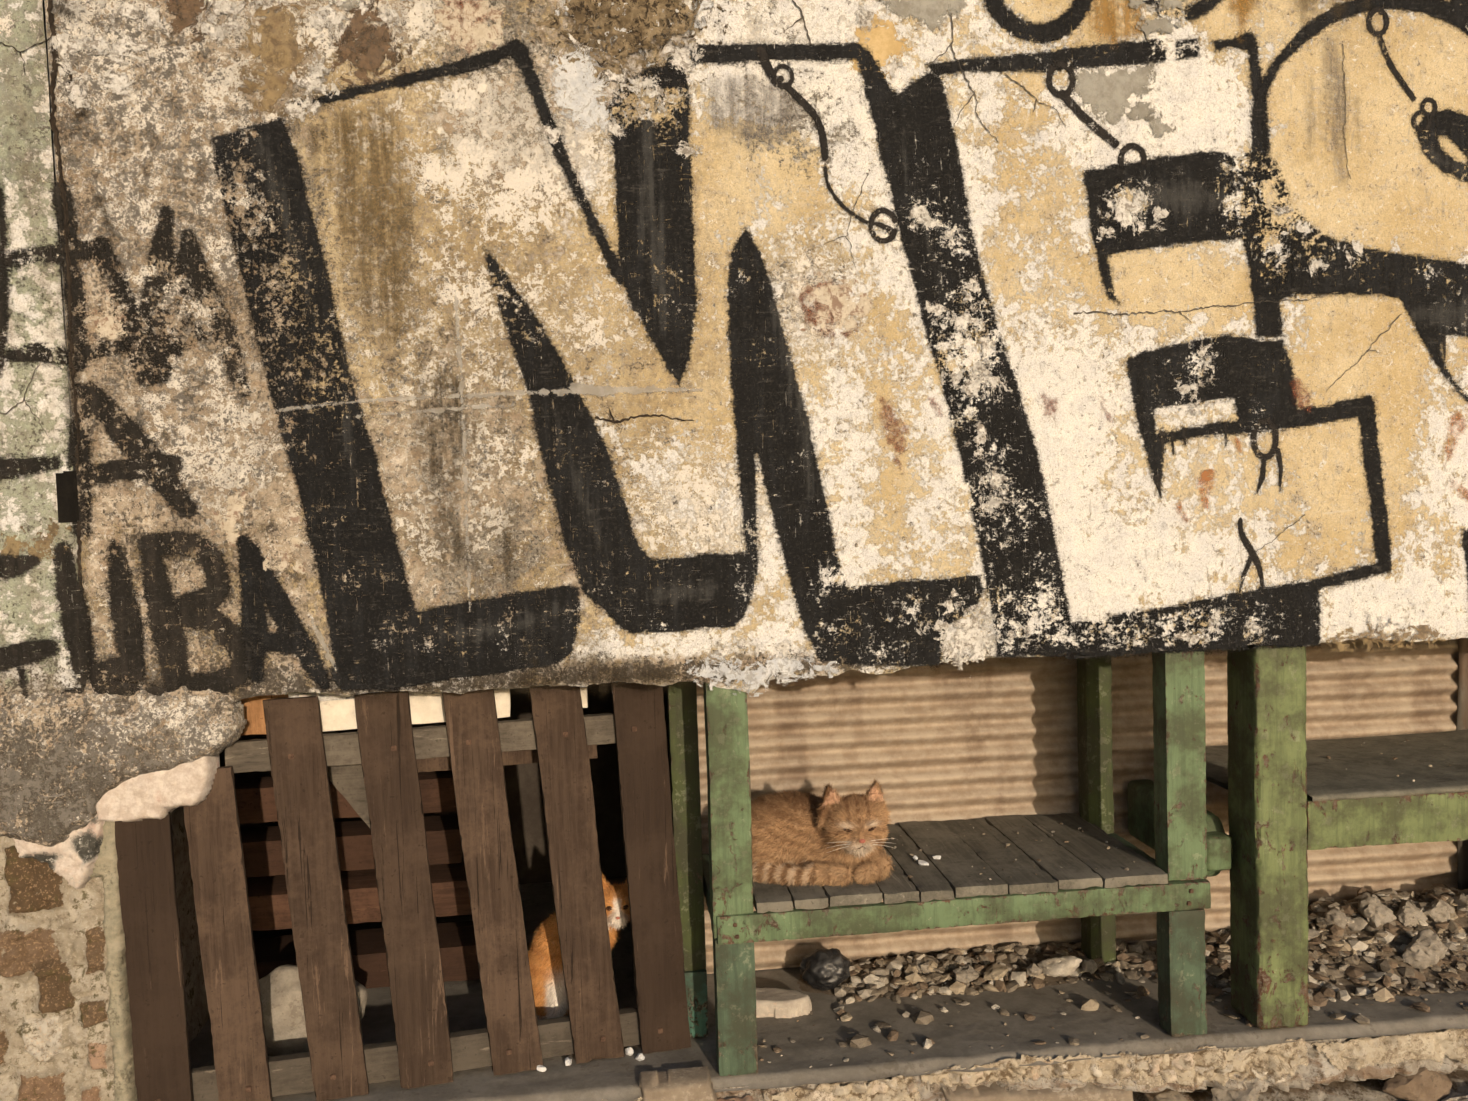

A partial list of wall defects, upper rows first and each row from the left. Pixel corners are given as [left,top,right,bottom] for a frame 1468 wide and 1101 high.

flaking render [49,0,506,123]
flaking render [527,0,737,155]
peeling [845,0,967,85]
peeling [1074,60,1177,140]
peeling [1126,0,1192,42]
peeling [675,140,704,164]
crack [1326,314,1402,391]